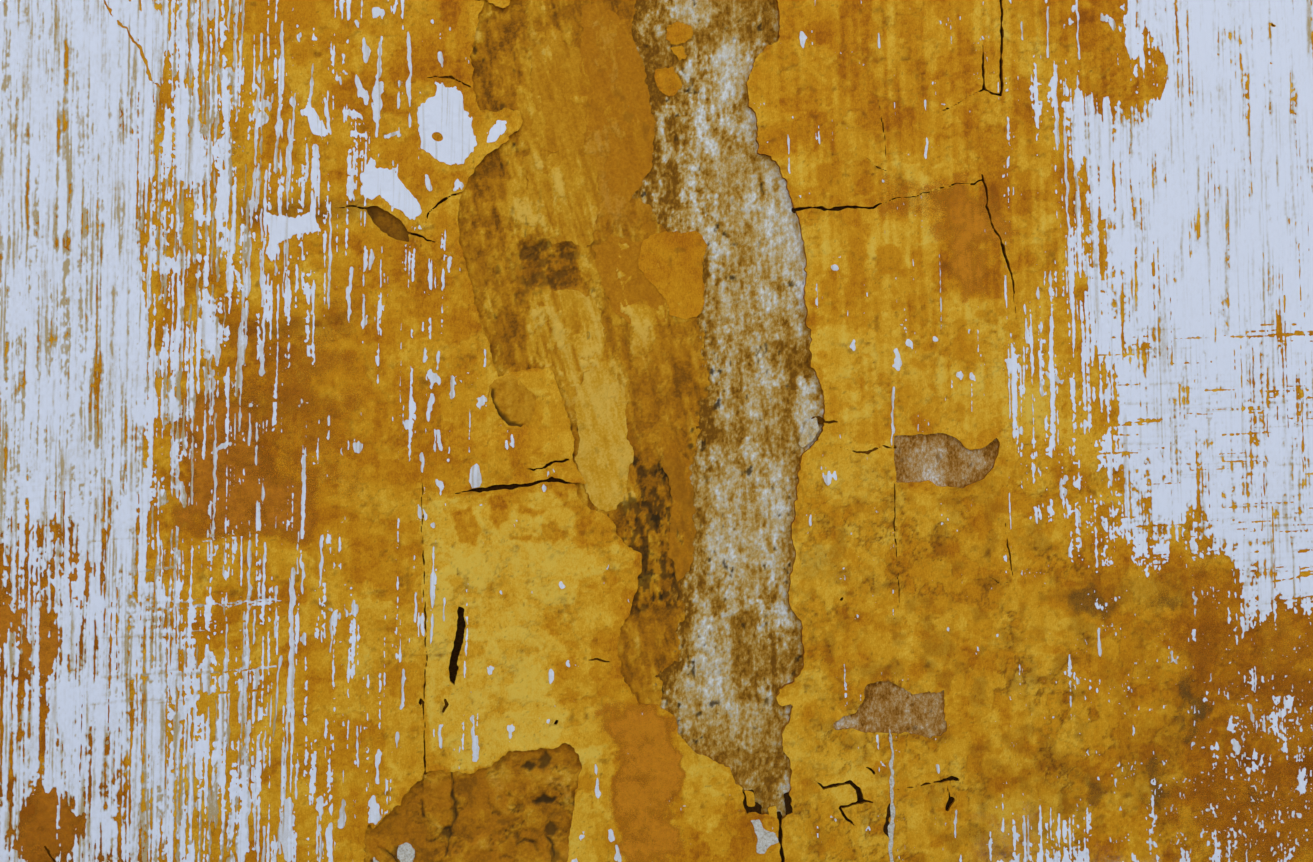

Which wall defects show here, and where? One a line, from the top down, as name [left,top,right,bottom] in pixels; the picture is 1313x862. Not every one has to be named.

crack [979,0,1003,96]
crack [791,107,1014,293]
peeling [0,0,582,862]
crack [455,459,571,494]
peeling [456,0,824,854]
peeling [894,433,998,488]
peeling [1018,0,1313,758]
crack [421,484,466,775]
crack [818,730,958,862]
peeling [988,802,1092,862]
peeling [1110,792,1185,862]
peeling [1173,788,1312,862]